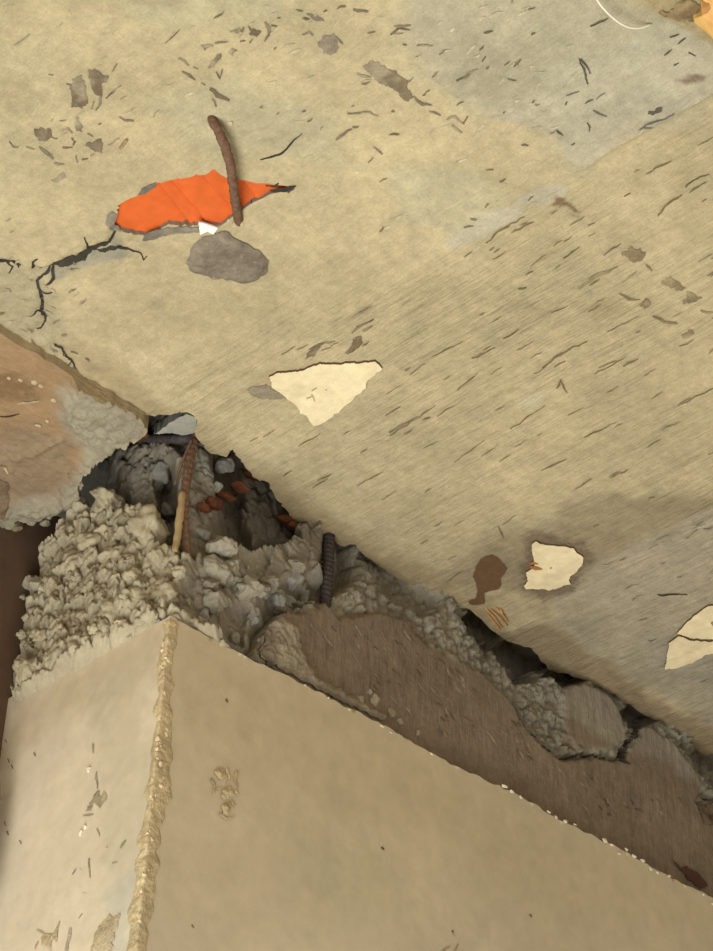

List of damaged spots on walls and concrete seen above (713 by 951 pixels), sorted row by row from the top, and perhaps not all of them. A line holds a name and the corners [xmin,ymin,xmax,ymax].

spalling [142,5,279,284]
spalling [657,174,709,217]
spalling [105,212,121,232]
spalling [473,202,536,252]
crack [0,231,147,368]
spalling [542,341,588,368]
peeling [247,319,382,447]
spalling [389,406,435,436]
peeling [524,540,583,591]
peeling [664,604,713,670]
spalling [10,412,404,951]